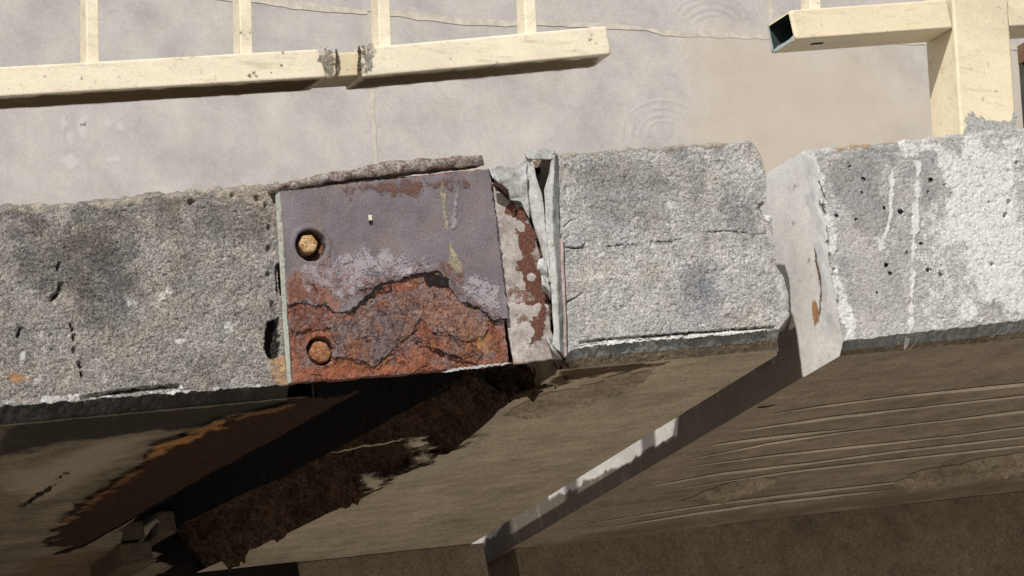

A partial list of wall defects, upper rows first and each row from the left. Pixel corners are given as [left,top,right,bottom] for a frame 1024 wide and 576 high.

leakage [1011,50,1023,129]
leakage [557,0,944,350]
spalling [155,169,572,571]
corrosion [270,253,507,385]
crack [289,271,508,376]
corrosion [502,200,552,346]
leakage [481,236,1024,563]
corrosion [812,301,820,325]